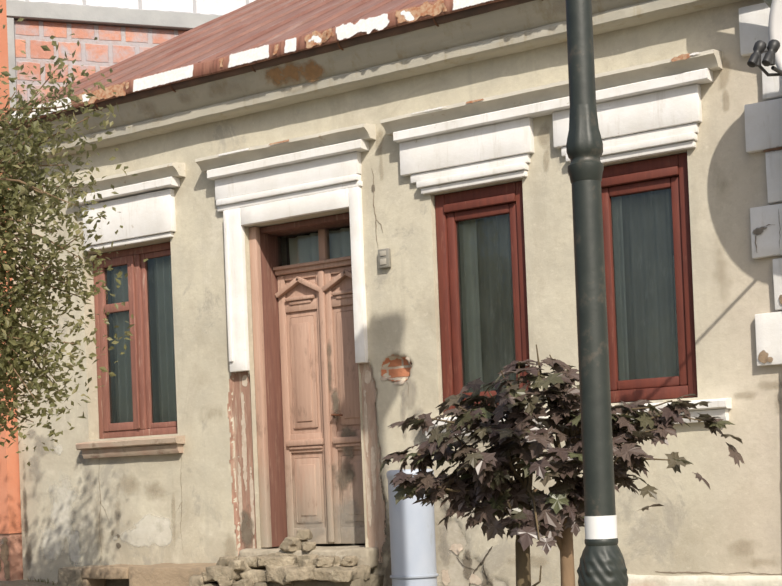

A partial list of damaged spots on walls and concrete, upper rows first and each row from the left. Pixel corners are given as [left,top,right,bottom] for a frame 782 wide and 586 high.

rust [266,60,323,84]
crack [371,168,383,245]
spalling [753,210,781,252]
spalling [758,350,773,363]
peeling [227,371,257,555]
peeling [359,355,412,562]
crack [457,546,493,586]